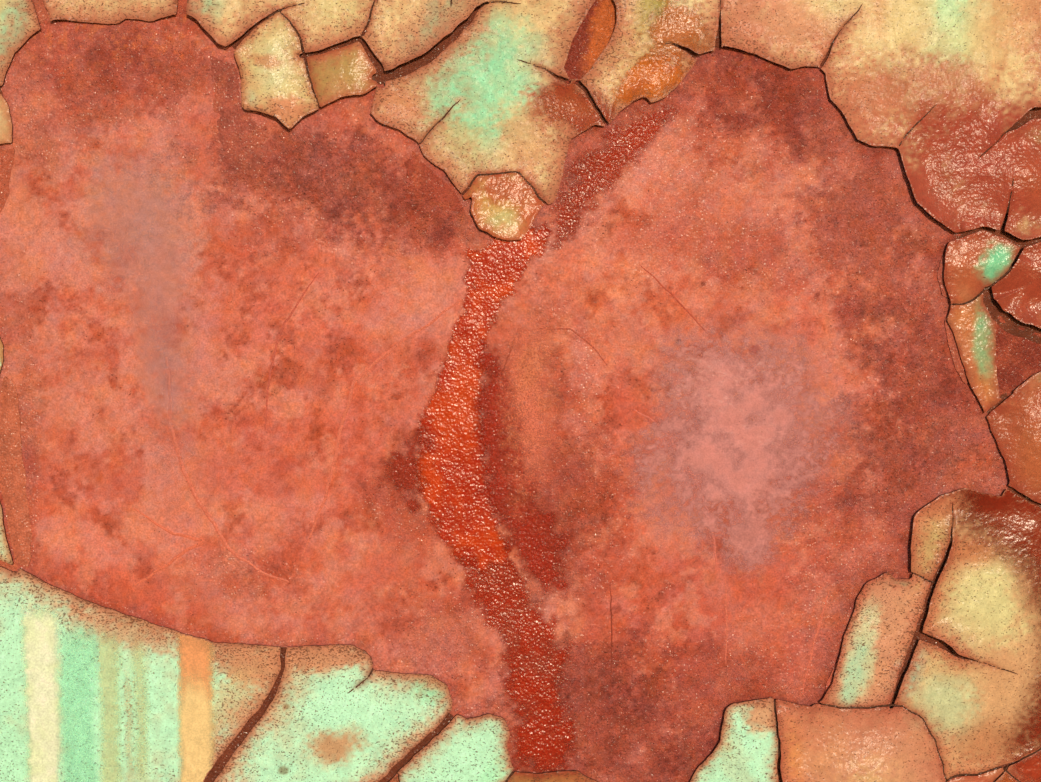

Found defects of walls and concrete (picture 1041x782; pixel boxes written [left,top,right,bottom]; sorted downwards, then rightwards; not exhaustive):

crack [232,0,521,106]
crack [519,60,607,124]
crack [665,0,721,59]
crack [953,178,1041,344]
peeling [0,0,617,782]
rust [385,0,709,771]
peeling [483,0,1041,782]
rust [179,635,214,782]
crack [204,647,287,782]
crack [379,713,453,782]
crack [774,701,783,782]
crack [822,503,1041,782]